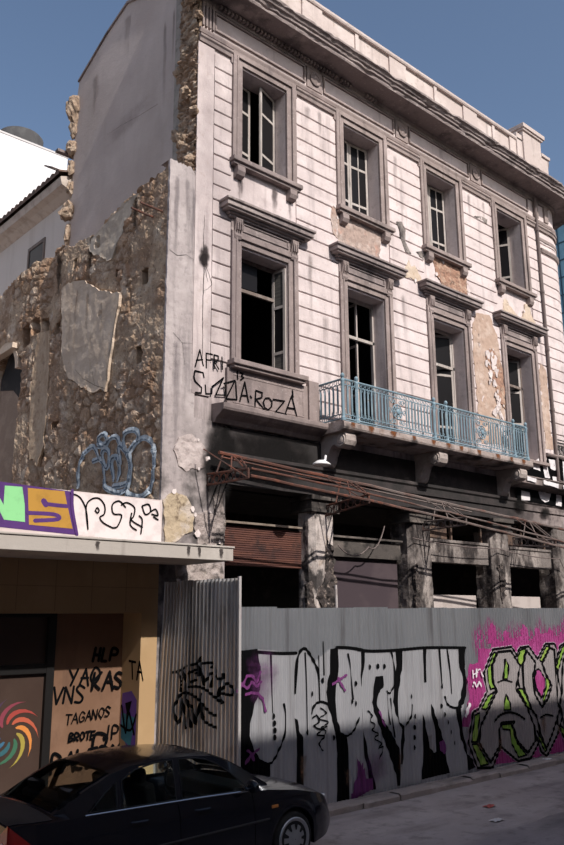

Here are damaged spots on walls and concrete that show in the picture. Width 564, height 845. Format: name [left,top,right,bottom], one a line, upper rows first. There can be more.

flaking render [171,0,204,171]
spalling [58,95,80,246]
flaking render [330,205,381,257]
flaking render [396,220,470,295]
flaking render [472,313,508,445]
spalling [173,434,210,472]
spalling [162,489,226,546]